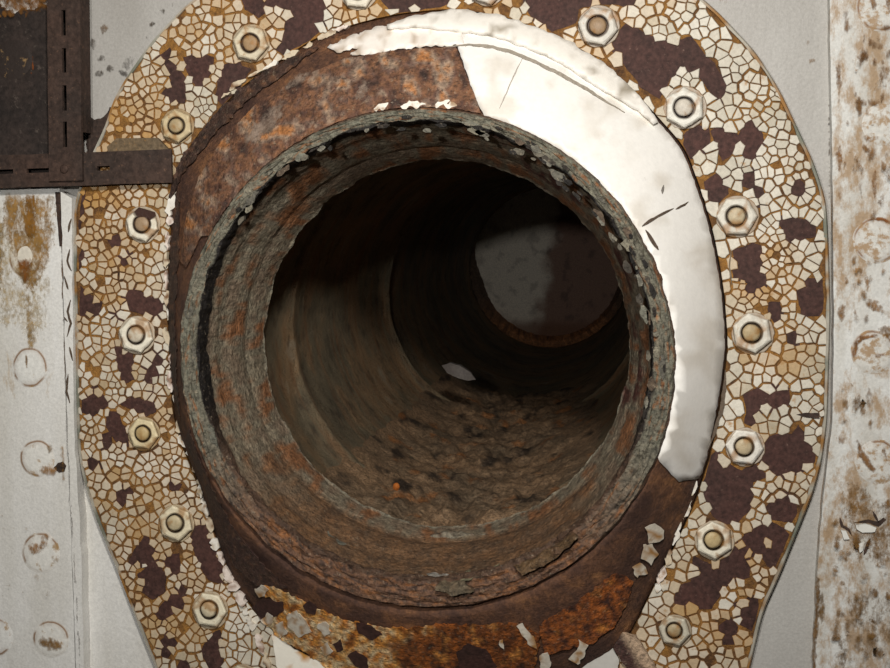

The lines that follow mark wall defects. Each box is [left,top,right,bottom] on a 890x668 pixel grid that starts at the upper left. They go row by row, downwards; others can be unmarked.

crack [446,44,625,113]
peeling [461,120,503,141]
corrosion [167,46,481,417]
crack [642,185,688,250]
corrosion [0,195,53,365]
corrosion [845,257,883,321]
corrosion [853,327,890,355]
crack [709,370,726,448]
corrosion [858,443,875,471]
corrosion [185,428,633,668]
corrosion [833,488,890,575]
spalling [456,643,497,668]